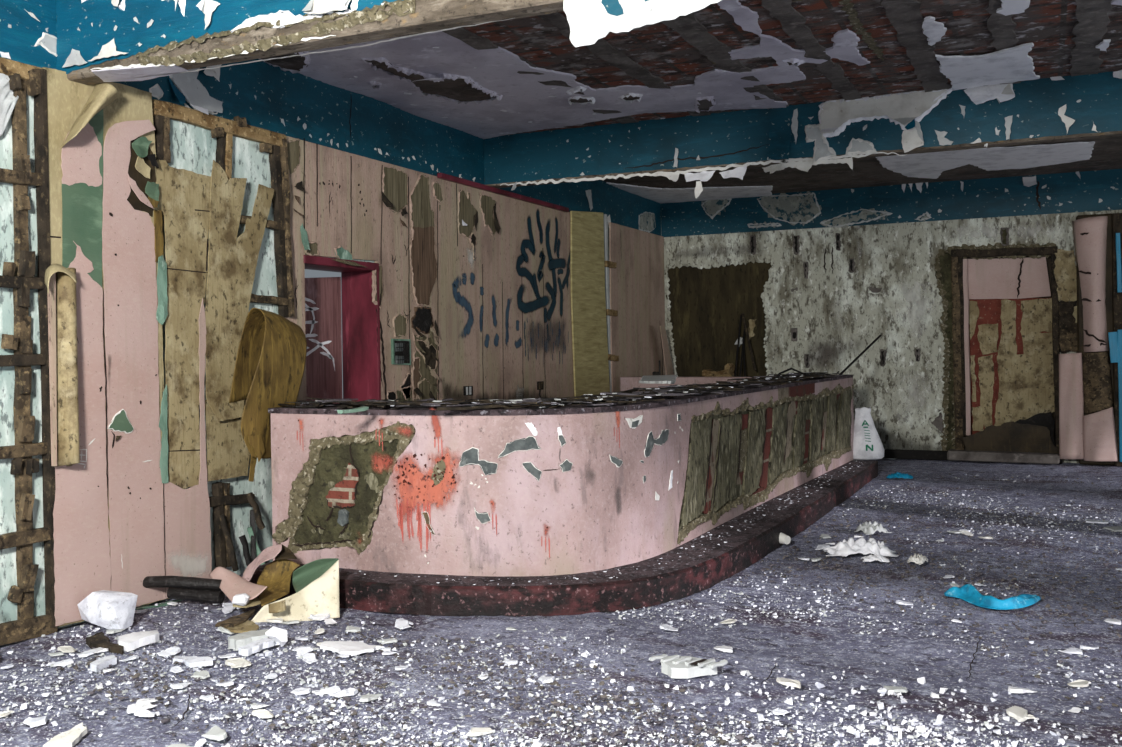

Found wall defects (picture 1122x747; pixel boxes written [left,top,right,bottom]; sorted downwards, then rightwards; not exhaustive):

spalling [27,0,415,115]
peeling [563,0,722,47]
peeling [374,148,443,306]
peeling [452,171,501,260]
flaking render [602,83,1122,229]
peeling [386,314,440,402]
leakage [664,256,779,377]
flaking render [272,421,415,555]
rust [394,409,458,550]
peeling [459,423,542,488]
flaking render [625,383,855,545]
leakage [880,431,930,450]